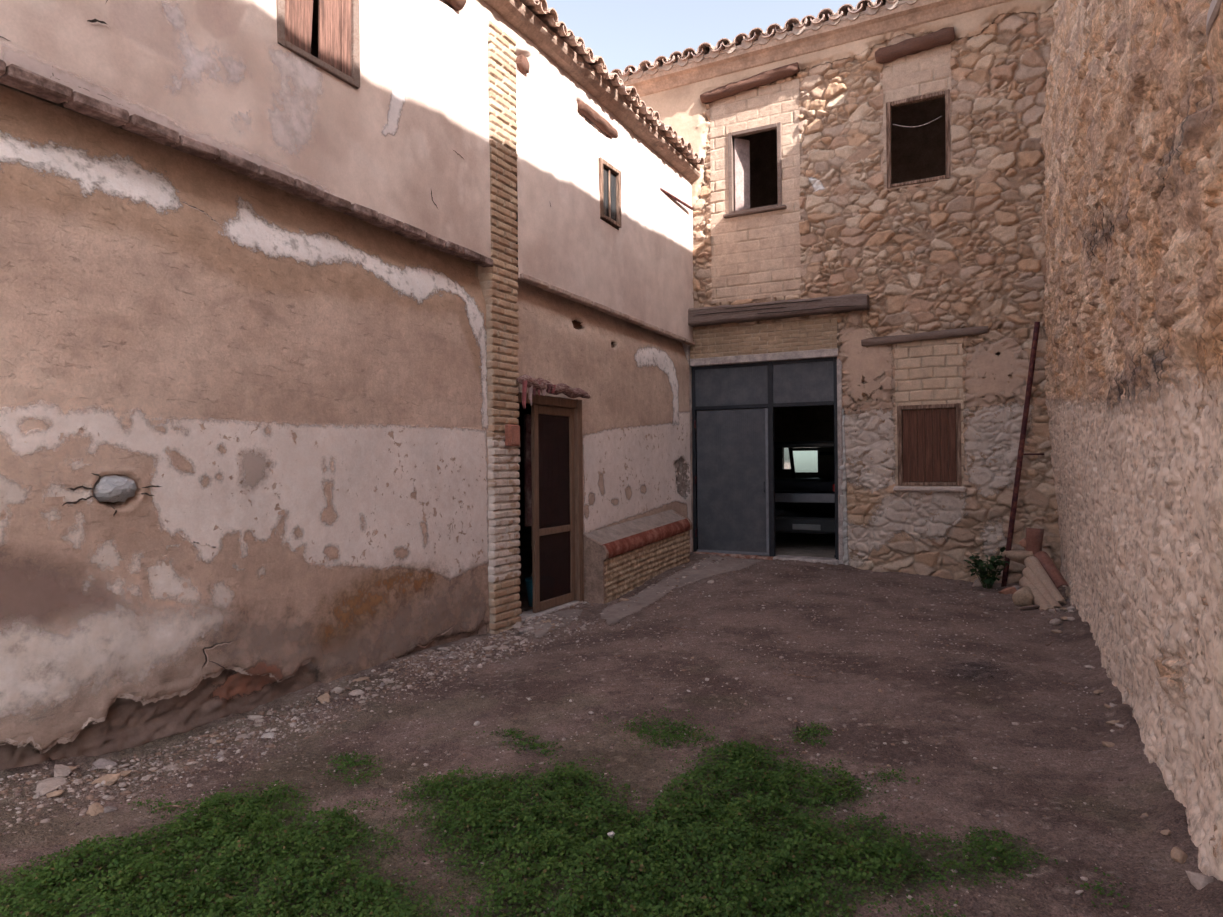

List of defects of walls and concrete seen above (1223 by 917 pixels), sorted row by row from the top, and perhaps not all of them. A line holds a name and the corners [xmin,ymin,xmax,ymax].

crack [87,0,111,29]
peeling [0,401,489,610]
peeling [582,412,692,552]
flaking render [406,620,487,654]
flaking render [0,659,321,771]